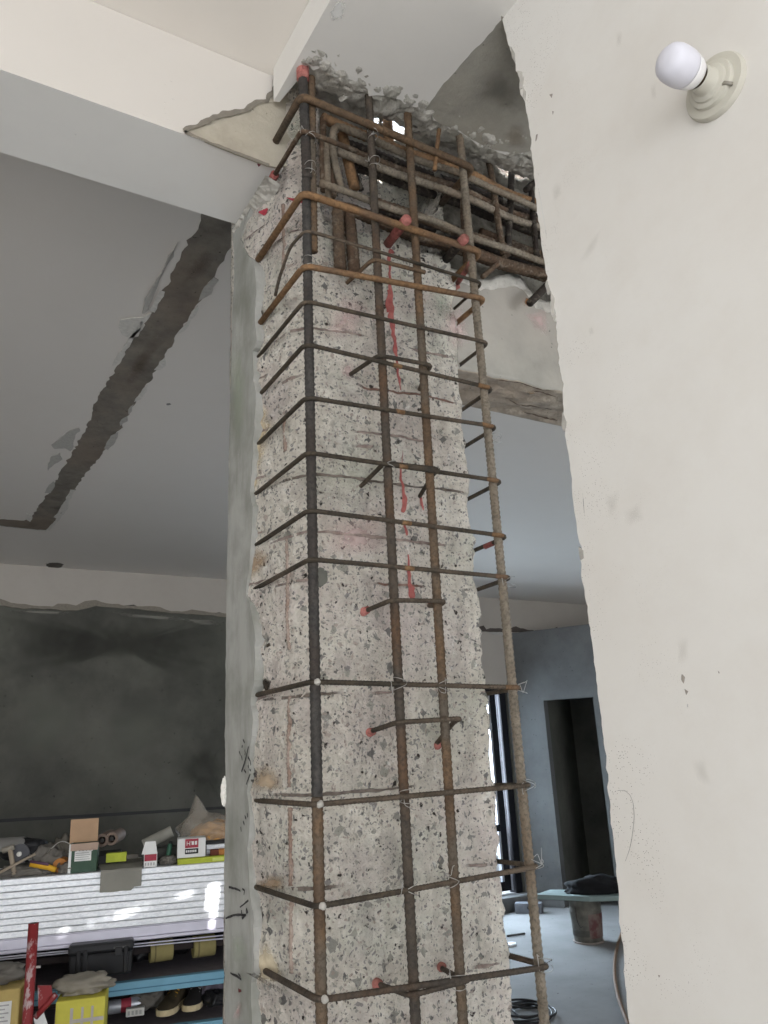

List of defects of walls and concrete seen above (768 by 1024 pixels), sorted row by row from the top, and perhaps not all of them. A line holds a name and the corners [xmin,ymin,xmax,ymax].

peeling [301,16,538,213]
peeling [0,82,298,531]
flaking render [318,567,328,587]
corrosion [259,951,278,978]